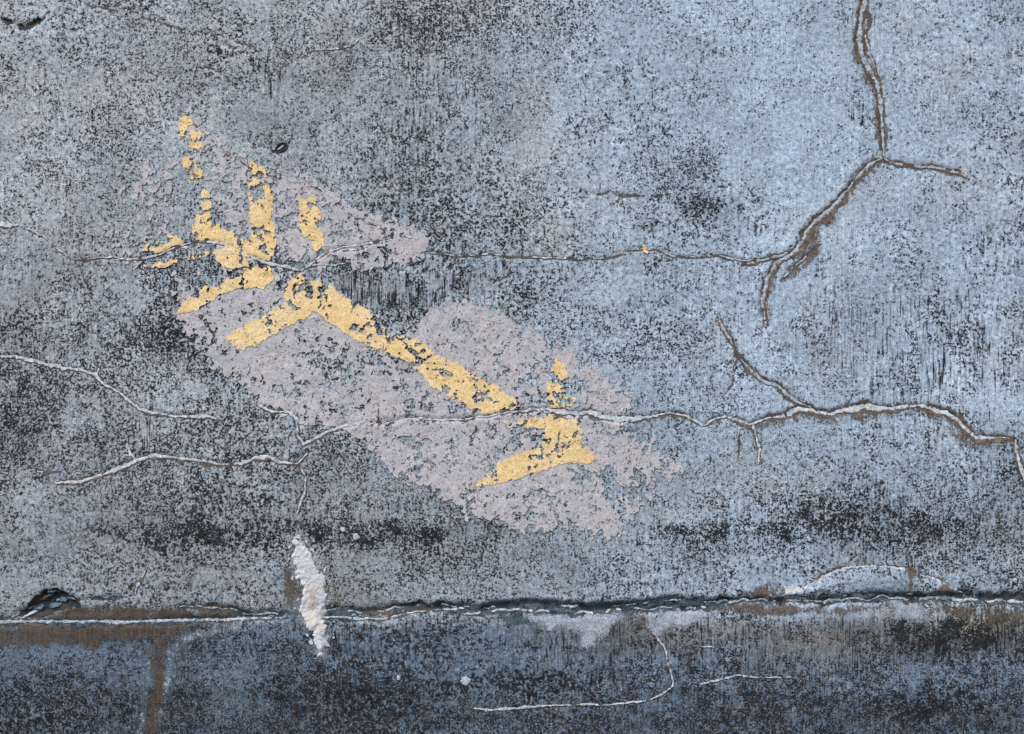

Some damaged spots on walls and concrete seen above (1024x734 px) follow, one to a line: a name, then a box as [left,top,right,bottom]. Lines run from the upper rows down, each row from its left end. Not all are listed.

crack [0,0,967,328]
crack [0,354,222,421]
peeling [102,104,686,542]
crack [37,313,1024,514]
spalling [18,588,81,618]
corrosion [0,603,241,734]
crack [0,570,290,630]
leakage [33,508,625,720]
crack [322,589,1024,712]